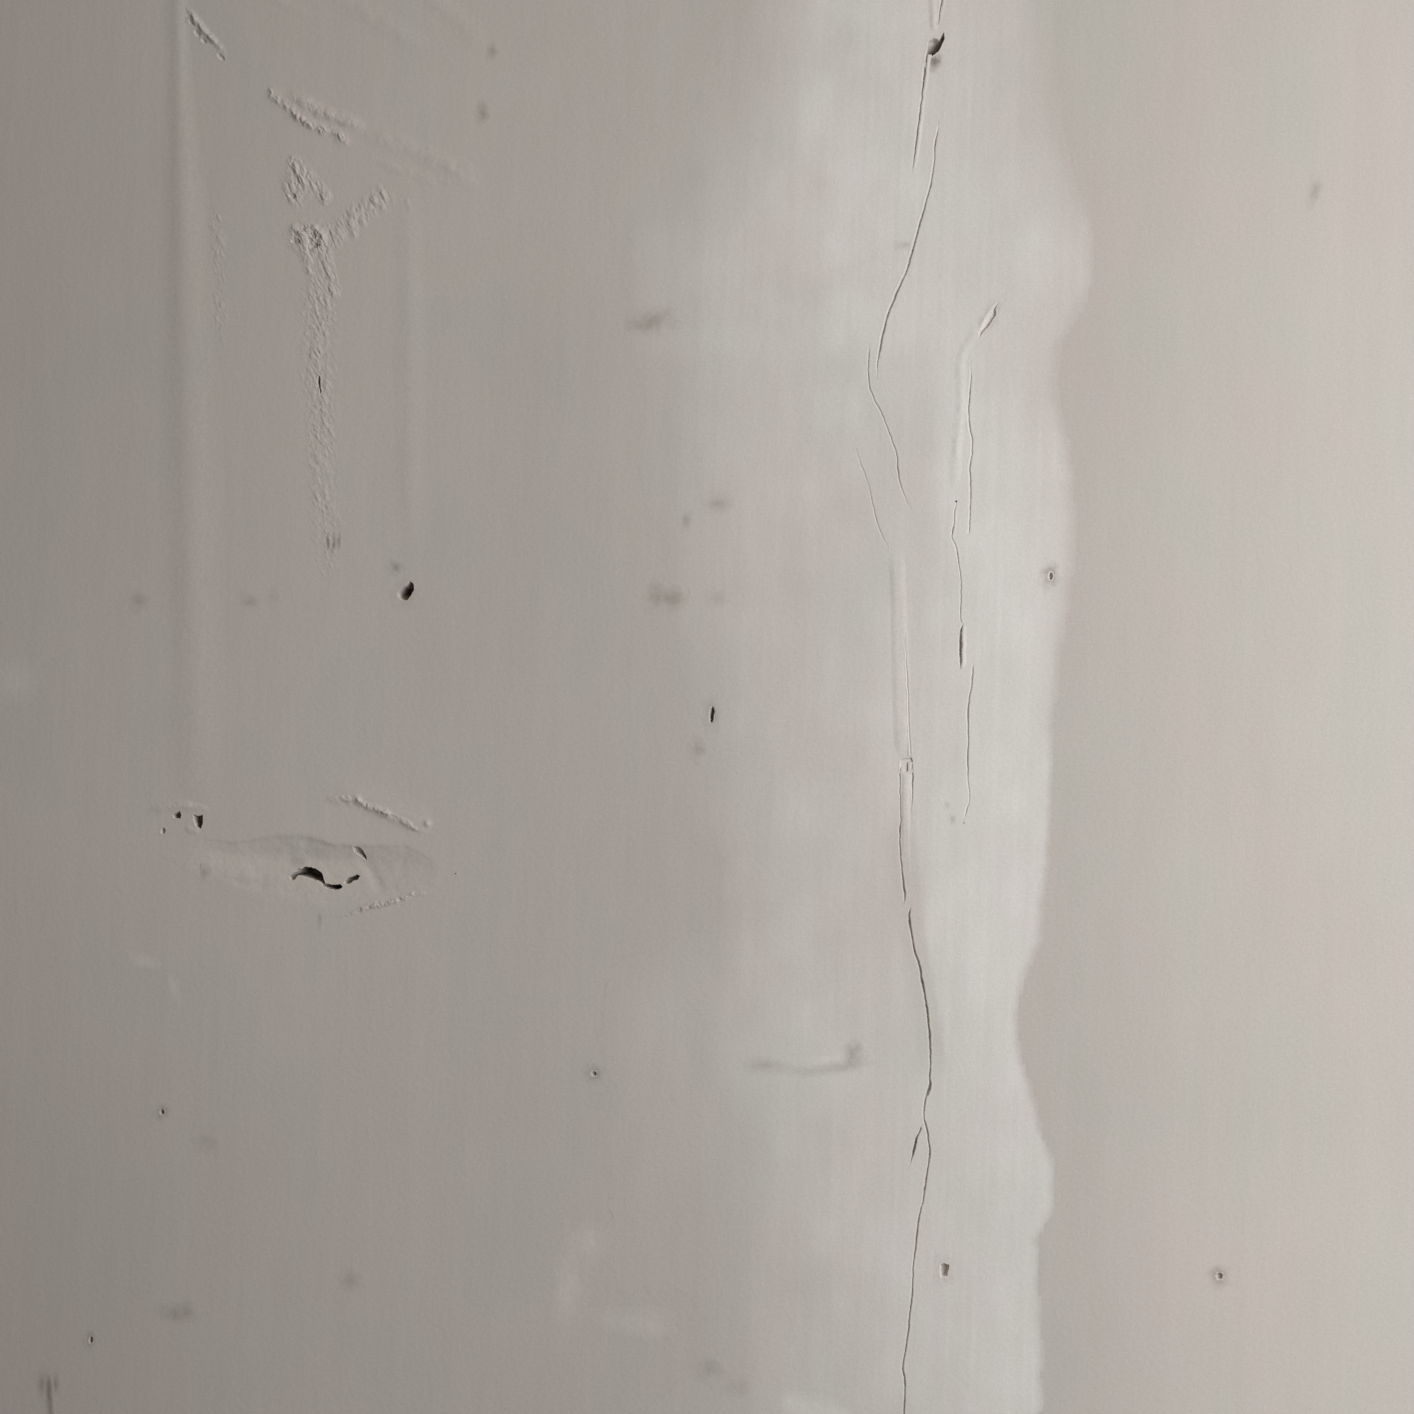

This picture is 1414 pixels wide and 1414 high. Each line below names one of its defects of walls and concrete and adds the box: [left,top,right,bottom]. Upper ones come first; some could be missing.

crack [856,0,946,1414]
crack [949,298,1003,823]